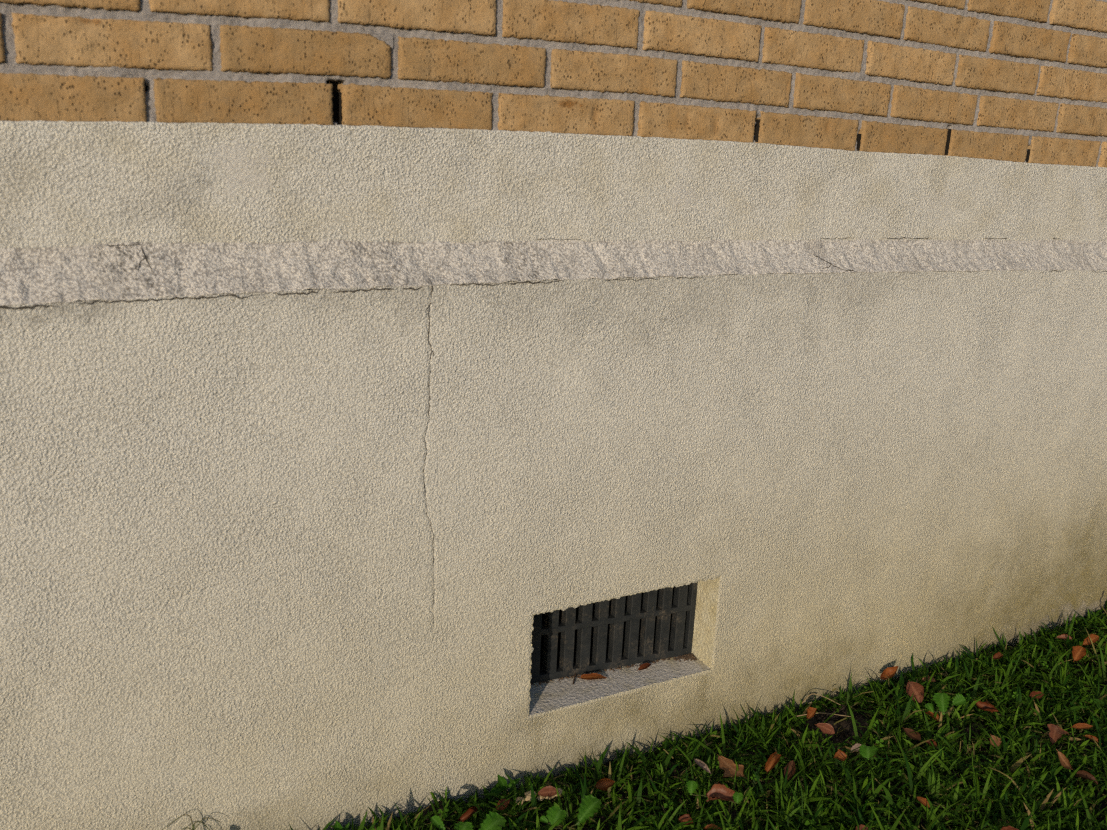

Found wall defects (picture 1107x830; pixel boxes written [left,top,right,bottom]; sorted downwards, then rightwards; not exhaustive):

crack [0,244,567,625]
crack [604,274,700,282]